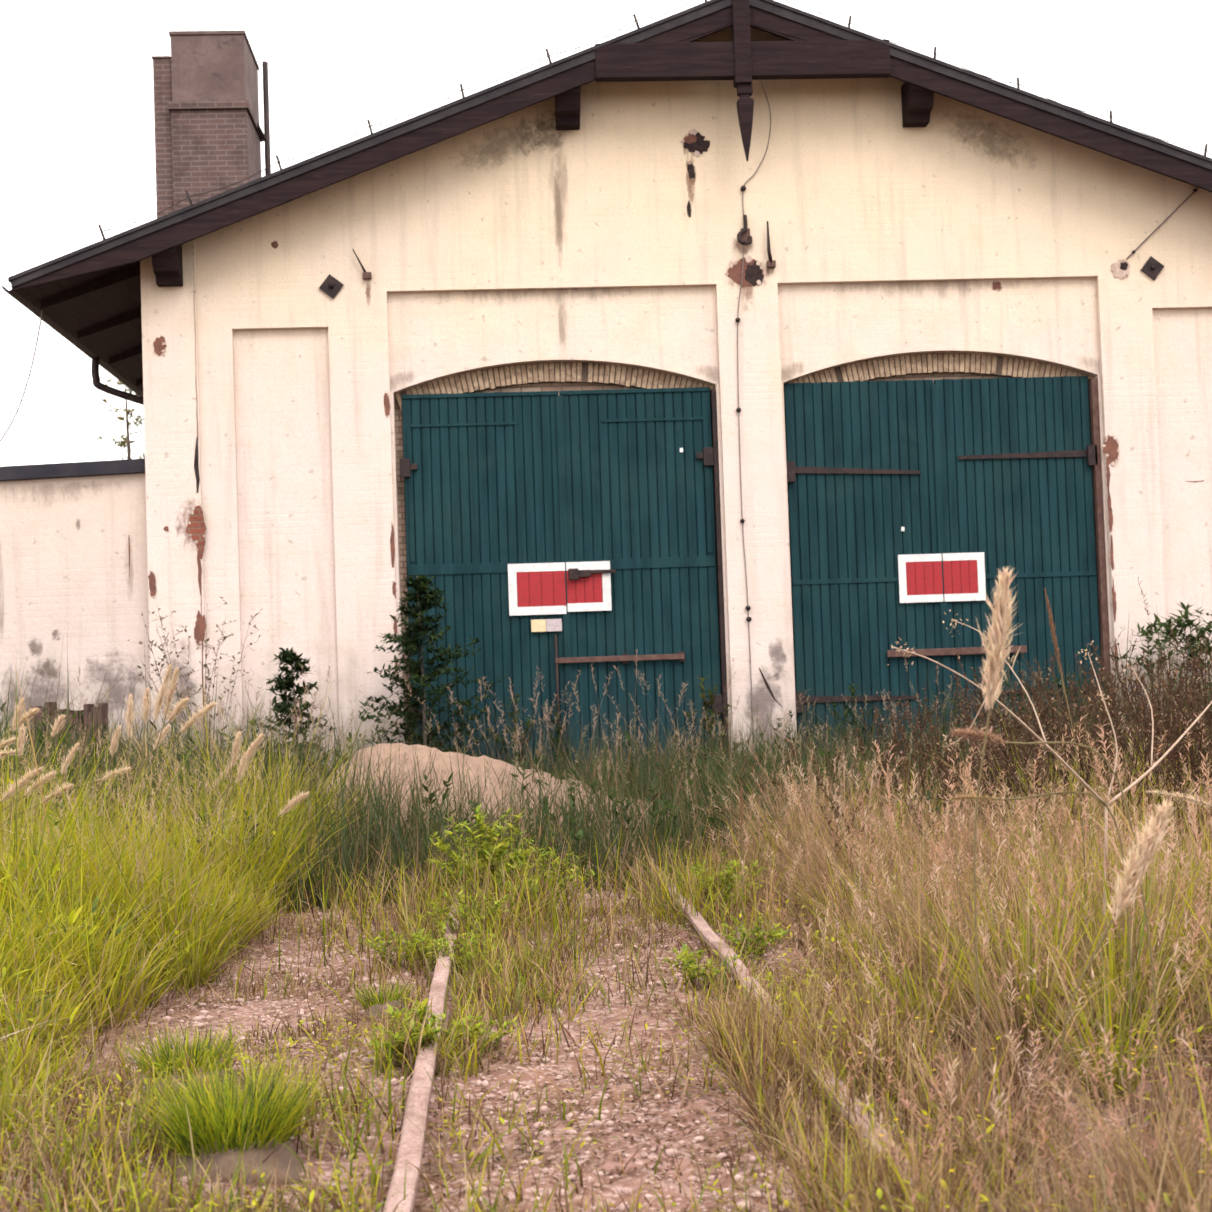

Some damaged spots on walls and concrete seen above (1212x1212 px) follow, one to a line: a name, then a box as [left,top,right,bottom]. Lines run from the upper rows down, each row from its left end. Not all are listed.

flaking render [681,129,710,180]
flaking render [725,255,767,295]
flaking render [185,504,206,559]
flaking render [1101,435,1119,622]
flaking render [194,610,206,644]